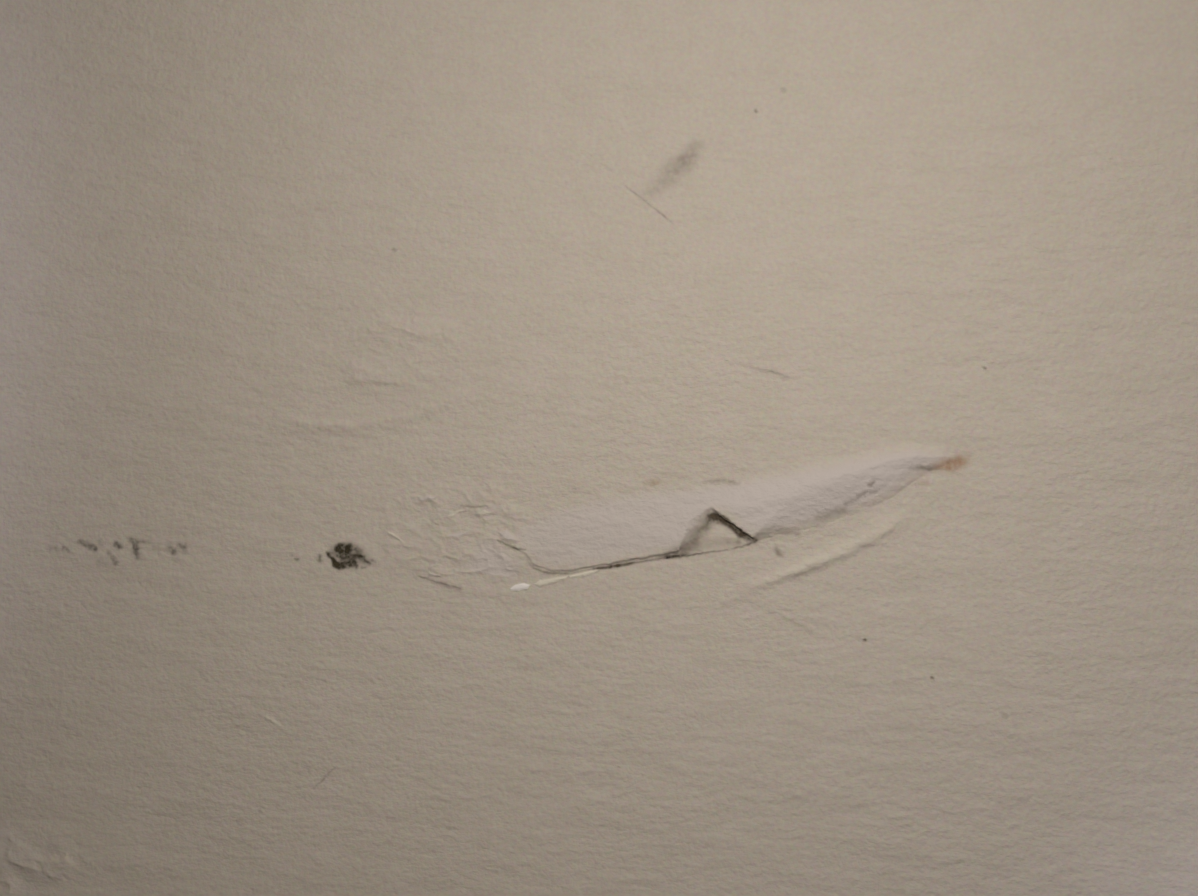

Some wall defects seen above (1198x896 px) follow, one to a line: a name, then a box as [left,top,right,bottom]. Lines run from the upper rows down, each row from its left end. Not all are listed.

crack [708,513,757,542]
crack [509,562,633,592]